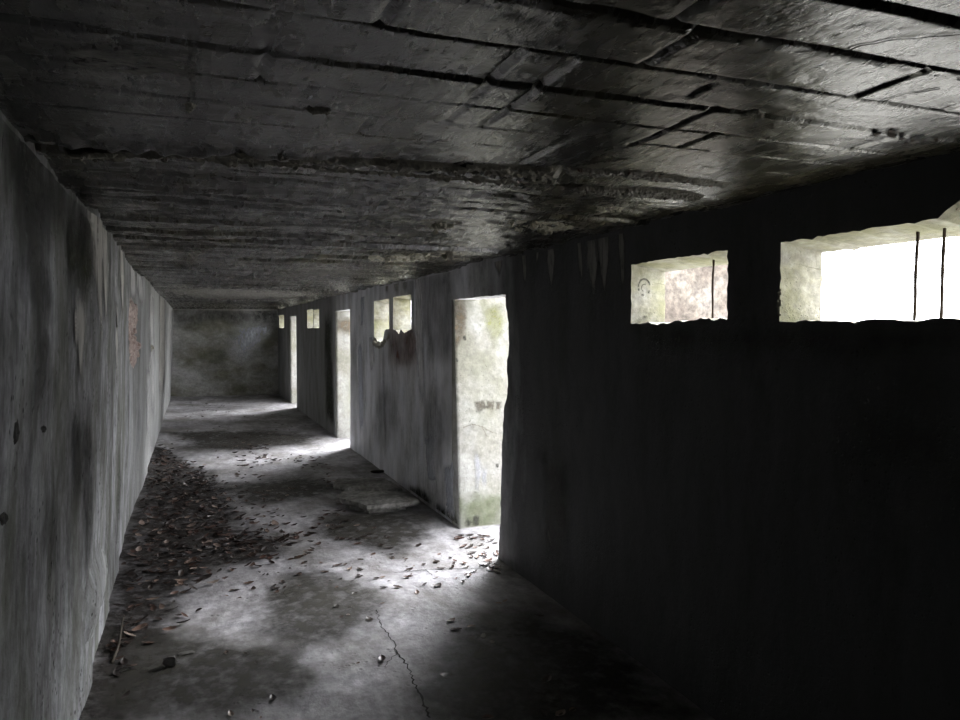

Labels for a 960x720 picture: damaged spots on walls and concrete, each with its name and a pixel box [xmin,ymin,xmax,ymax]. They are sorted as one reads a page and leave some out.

spalling [372,333,390,349]
crack [376,611,431,718]